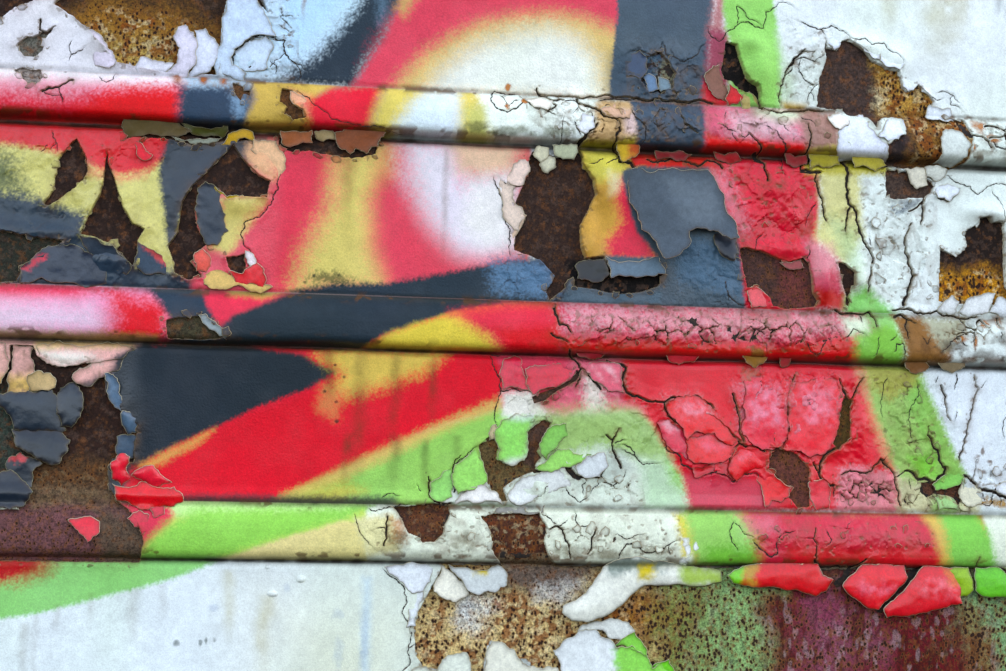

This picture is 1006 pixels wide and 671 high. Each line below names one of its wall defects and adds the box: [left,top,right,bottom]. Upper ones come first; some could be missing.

peeling [0,0,33,25]
peeling [14,34,50,89]
peeling [55,0,276,105]
peeling [0,86,386,294]
peeling [576,103,632,134]
peeling [498,142,818,309]
peeling [704,42,770,115]
crack [490,2,1006,613]
peeling [784,37,979,204]
peeling [932,217,1006,318]
peeling [0,340,184,568]
peeling [385,353,1006,671]